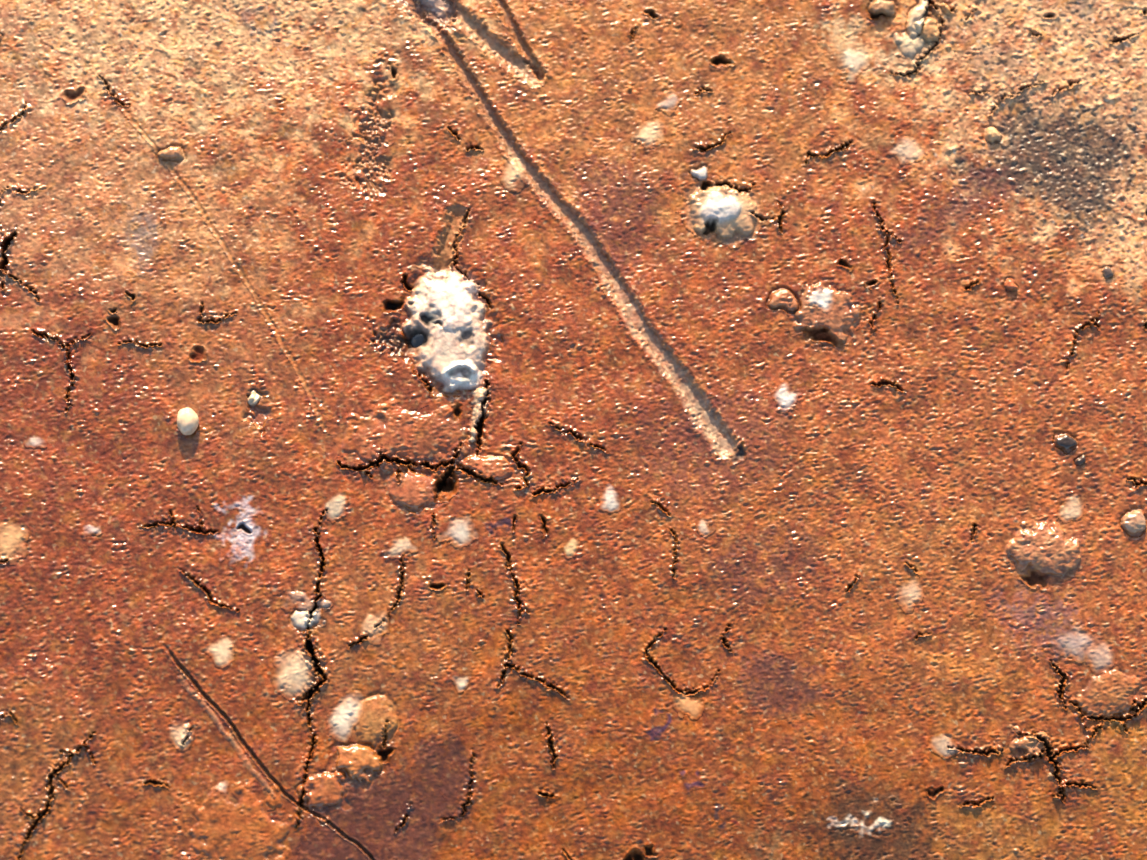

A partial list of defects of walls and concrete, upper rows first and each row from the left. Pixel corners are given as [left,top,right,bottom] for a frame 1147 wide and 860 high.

crack [0,185,40,302]
crack [31,329,162,415]
crack [336,379,580,541]
crack [548,422,609,454]
crack [142,506,220,535]
crack [294,509,328,831]
crack [347,554,405,650]
crack [495,542,570,700]
crack [645,624,733,696]
crack [440,748,476,822]
crack [538,722,559,798]
crack [947,659,1147,804]